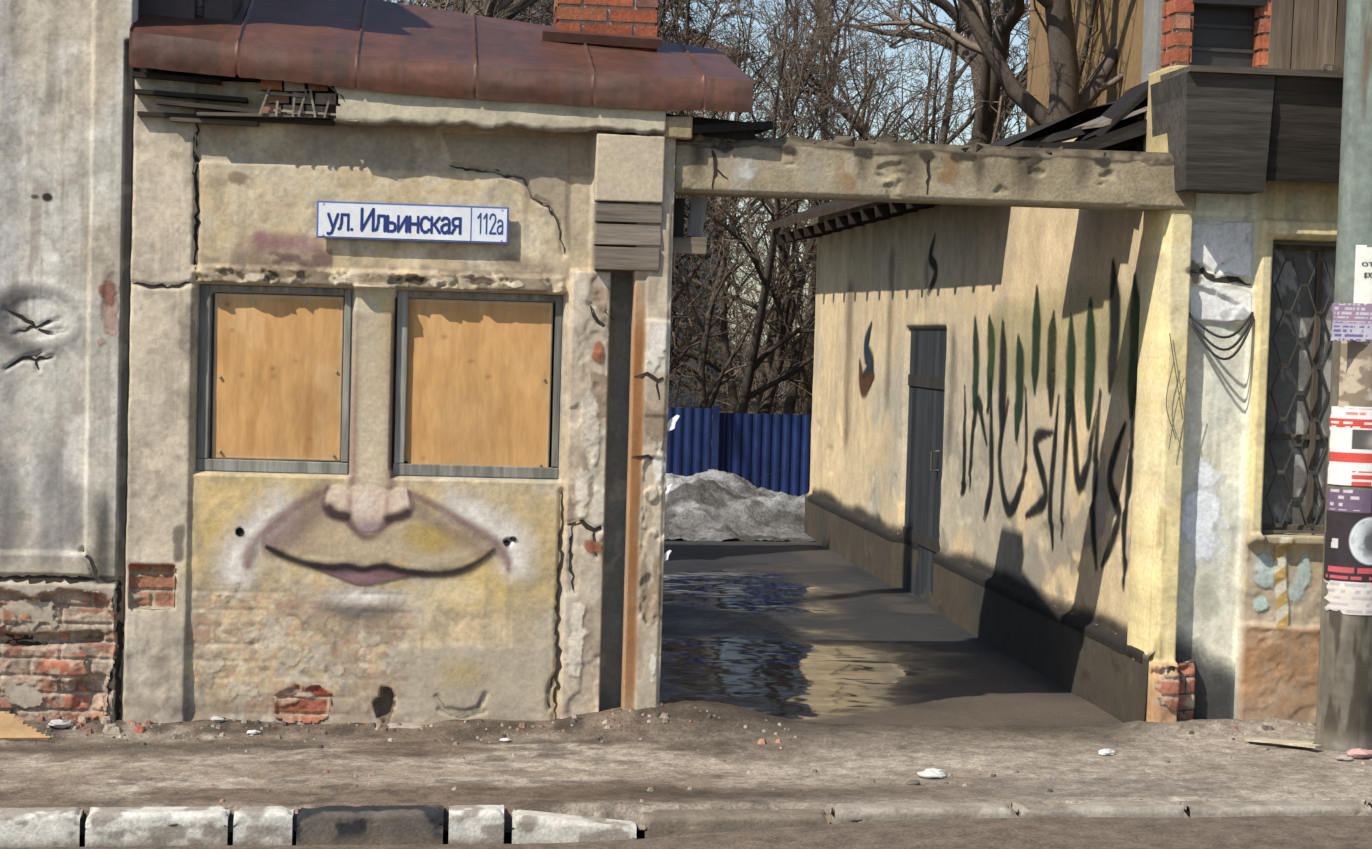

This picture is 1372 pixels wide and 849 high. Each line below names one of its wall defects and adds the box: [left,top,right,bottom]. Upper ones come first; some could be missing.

flaking render [592,287,610,312]
crack [1190,263,1251,285]
crack [5,309,67,370]
flaking render [647,324,669,383]
flaking render [568,341,608,517]
flaking render [645,408,667,499]
flaking render [584,540,602,553]
flaking render [640,555,662,623]
peeling [1252,533,1311,627]
flaking render [0,564,548,725]
flaking render [564,602,588,677]
flaking render [1154,663,1195,720]